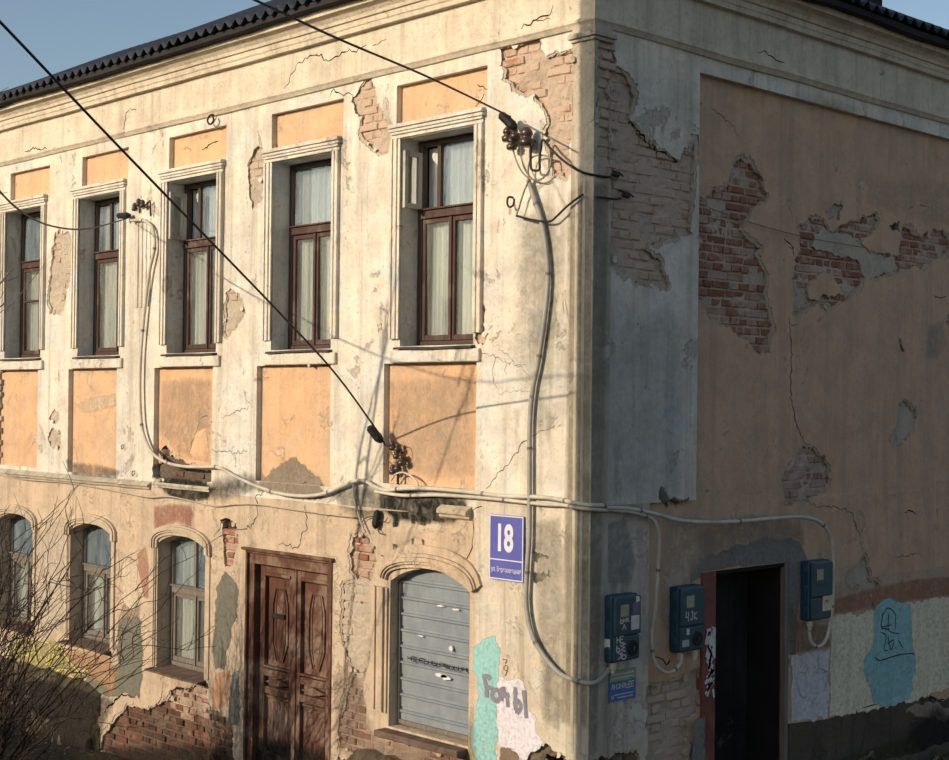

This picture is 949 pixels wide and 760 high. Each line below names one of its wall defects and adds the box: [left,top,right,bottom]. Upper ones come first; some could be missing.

crack [284,39,386,89]
spalling [351,78,391,157]
spalling [500,39,580,182]
spalling [594,41,777,355]
spalling [47,229,71,315]
spalling [222,288,246,340]
spalling [791,200,949,320]
crack [789,319,805,445]
spalling [336,531,469,760]
spalling [100,680,235,760]
spalling [527,743,566,760]
spalling [588,667,700,760]